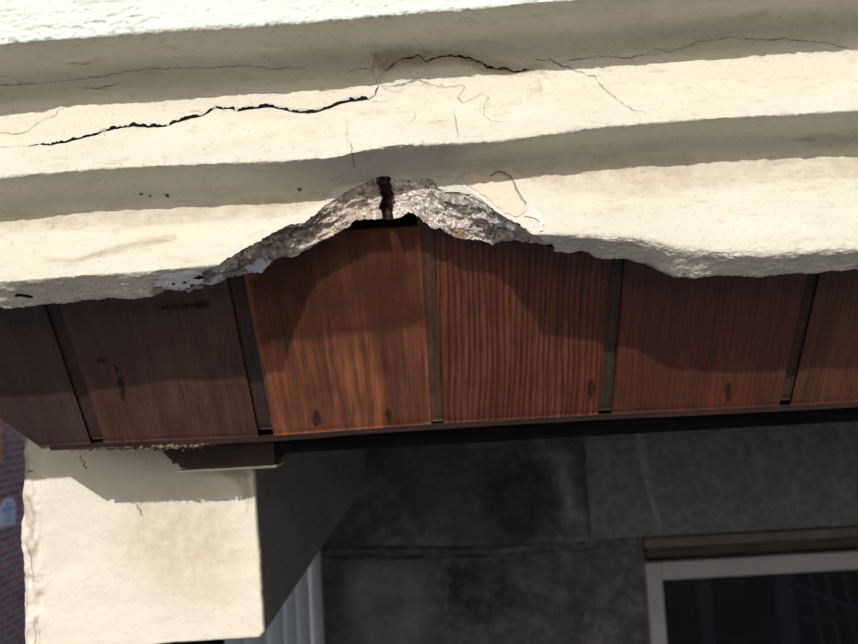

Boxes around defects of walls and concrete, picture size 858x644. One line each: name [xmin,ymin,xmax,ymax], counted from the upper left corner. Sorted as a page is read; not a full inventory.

crack [0,36,857,167]
spalling [153,171,552,297]